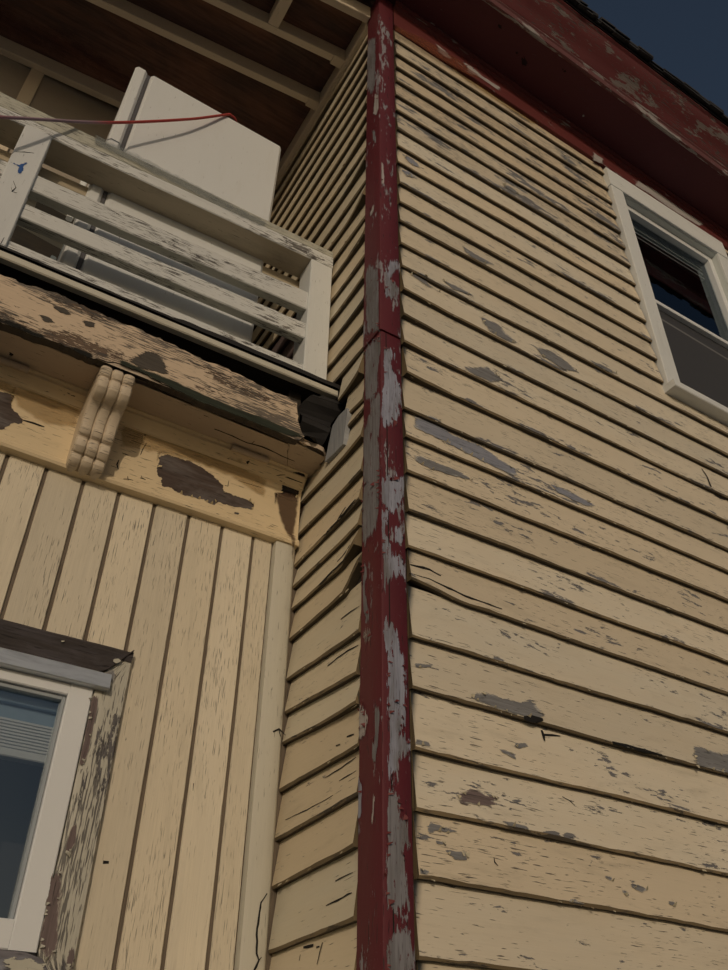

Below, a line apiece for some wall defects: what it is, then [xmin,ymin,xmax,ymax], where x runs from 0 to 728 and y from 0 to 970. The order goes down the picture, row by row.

peeling [463,62,500,90]
peeling [635,181,703,226]
spalling [0,391,23,430]
peeling [361,259,473,594]
peeling [414,415,517,476]
spalling [157,454,254,515]
crack [409,564,502,609]
peeling [79,696,98,765]
peeling [471,692,544,717]
peeling [357,615,433,970]
peeling [40,868,75,970]
crack [254,893,267,970]